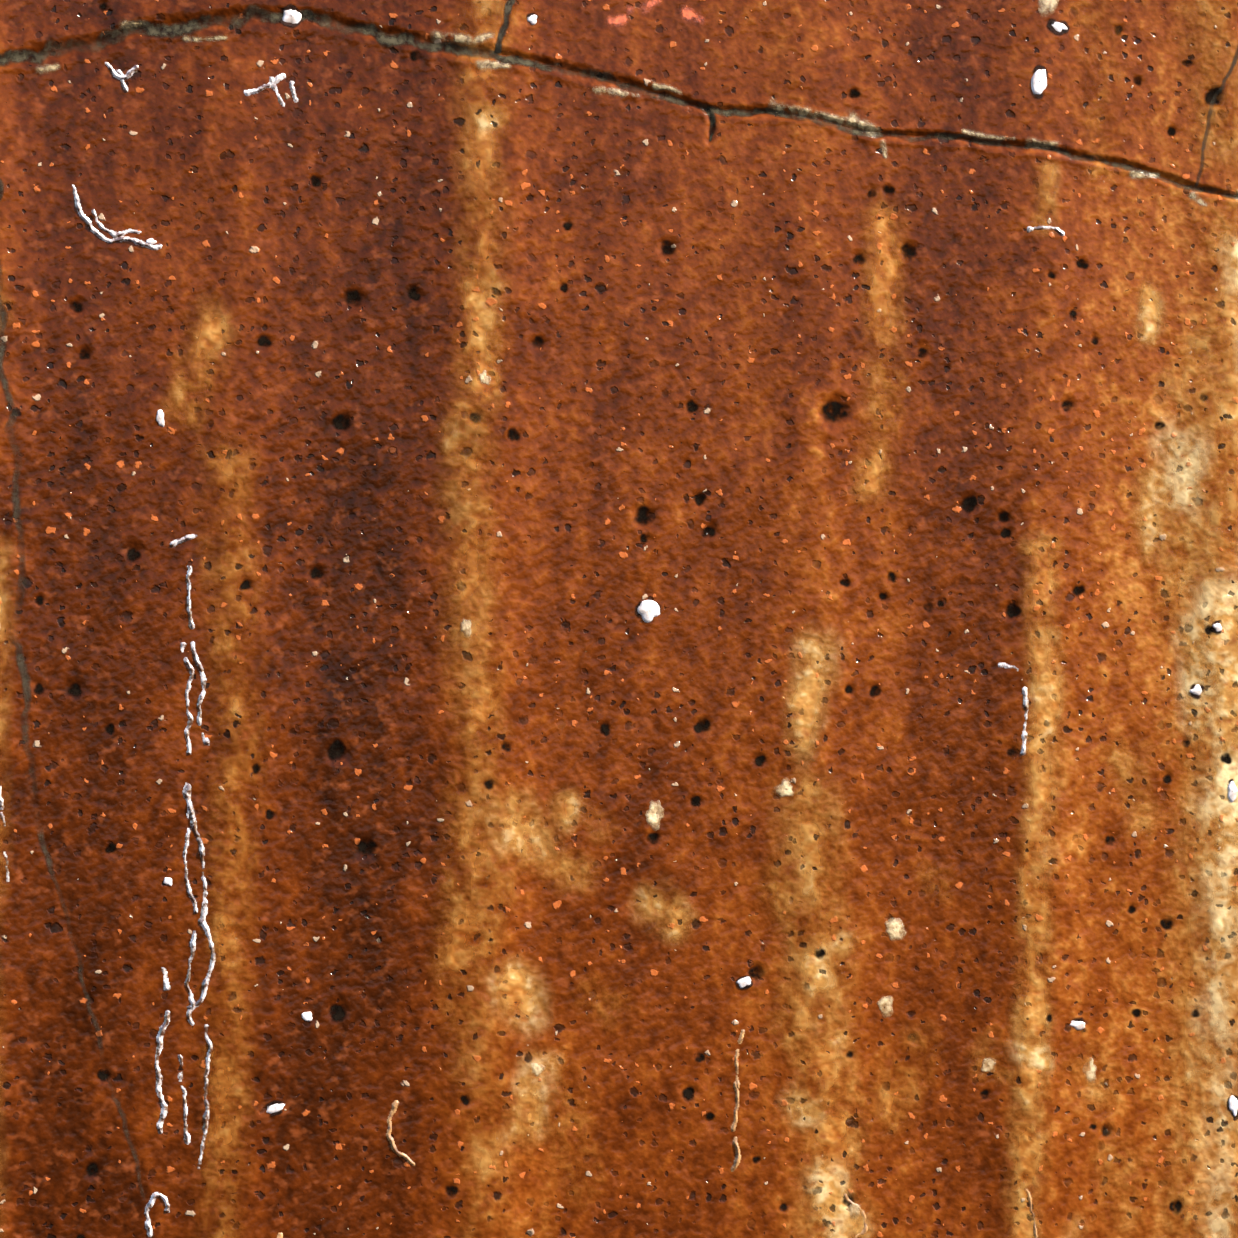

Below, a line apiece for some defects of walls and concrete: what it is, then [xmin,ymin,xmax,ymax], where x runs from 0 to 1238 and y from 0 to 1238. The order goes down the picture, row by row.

crack [0,43,59,72]
crack [97,0,559,71]
rust [608,7,632,25]
rust [682,7,704,23]
crack [590,50,1238,206]
damp [1141,285,1160,339]
crack [0,302,14,424]
damp [442,0,508,980]
crack [17,644,31,735]
damp [1165,211,1238,1238]
damp [502,796,582,881]
damp [497,967,536,1020]